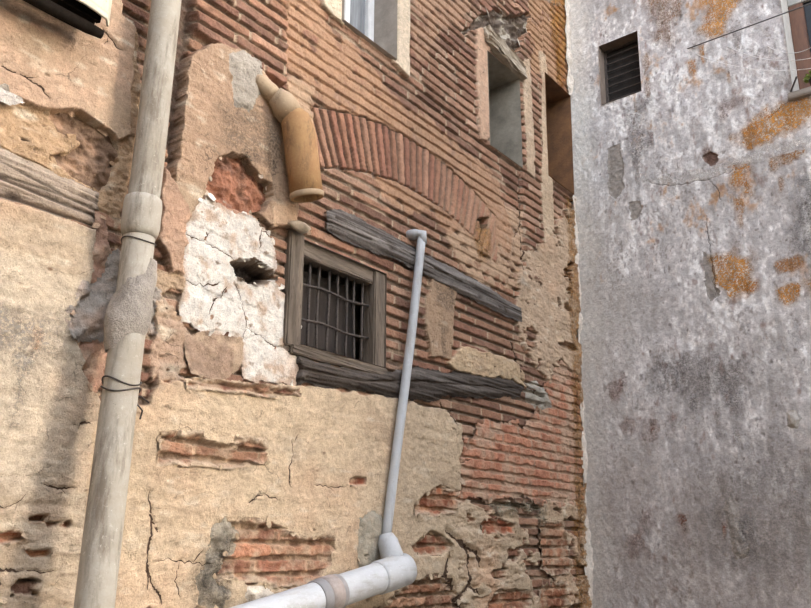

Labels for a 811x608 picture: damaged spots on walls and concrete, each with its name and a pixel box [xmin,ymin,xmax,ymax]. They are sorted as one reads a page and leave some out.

corrosion [688,0,739,75]
corrosion [743,98,811,149]
spalling [48,111,118,192]
crack [650,169,737,203]
peeling [178,156,302,398]
corrosion [709,253,757,297]
corrosion [776,280,811,304]
flaking render [156,429,270,471]
crack [44,484,76,494]
crack [146,491,212,605]
spalling [212,516,336,589]
crack [0,568,57,593]